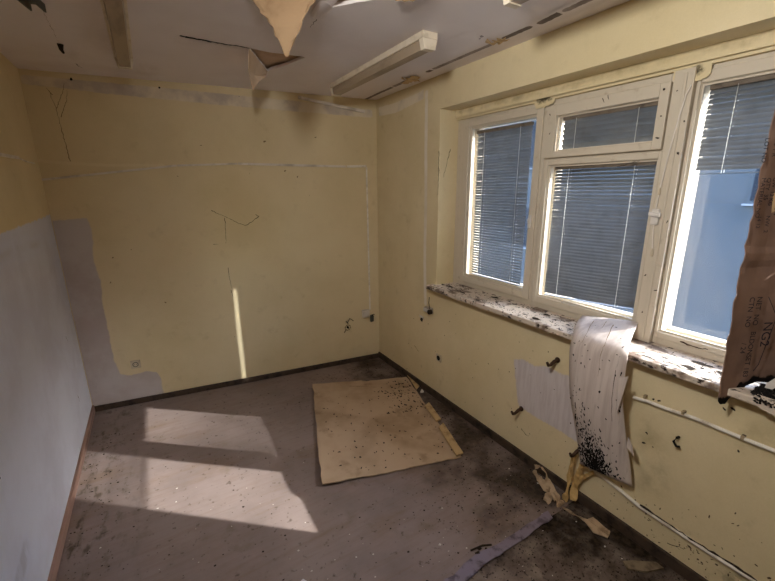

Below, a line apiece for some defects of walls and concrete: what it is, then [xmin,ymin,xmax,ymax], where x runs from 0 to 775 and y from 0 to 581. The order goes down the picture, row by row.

crack [180,35,249,51]
damp [570,385,775,581]